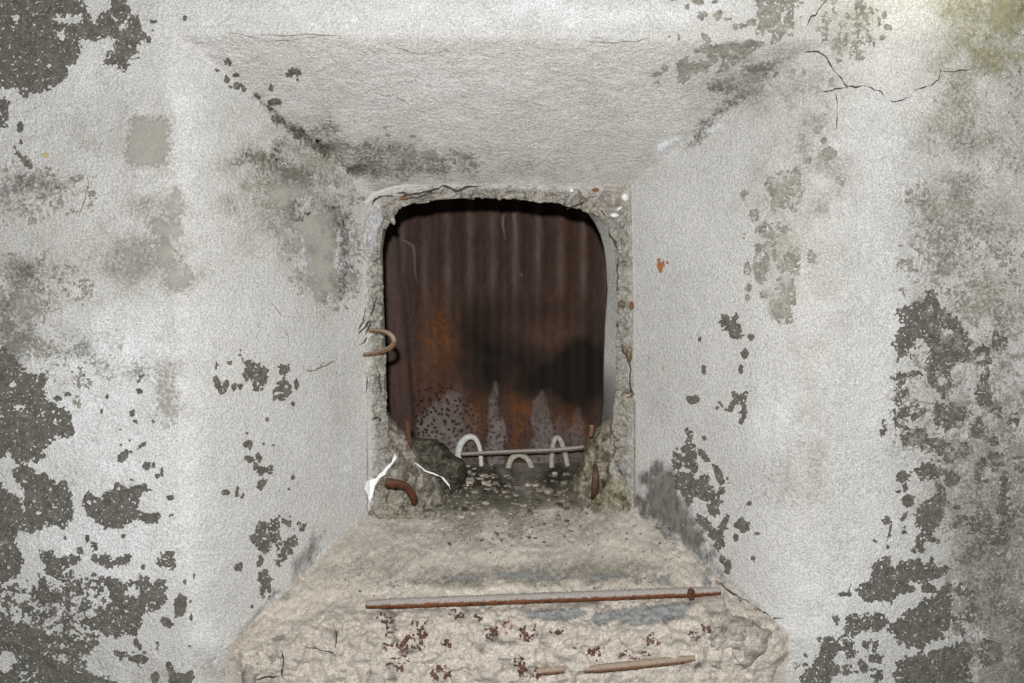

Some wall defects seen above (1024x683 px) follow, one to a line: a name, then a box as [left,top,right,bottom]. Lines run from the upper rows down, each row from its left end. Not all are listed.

peeling [652,0,804,85]
peeling [816,0,892,63]
peeling [0,0,157,226]
crack [807,51,972,127]
damp [235,94,475,304]
peeling [213,349,299,407]
spalling [234,156,1024,683]
peeling [0,248,195,683]
damp [640,461,708,561]
rust [429,663,452,681]
rust [513,655,564,680]
rust [365,587,721,673]